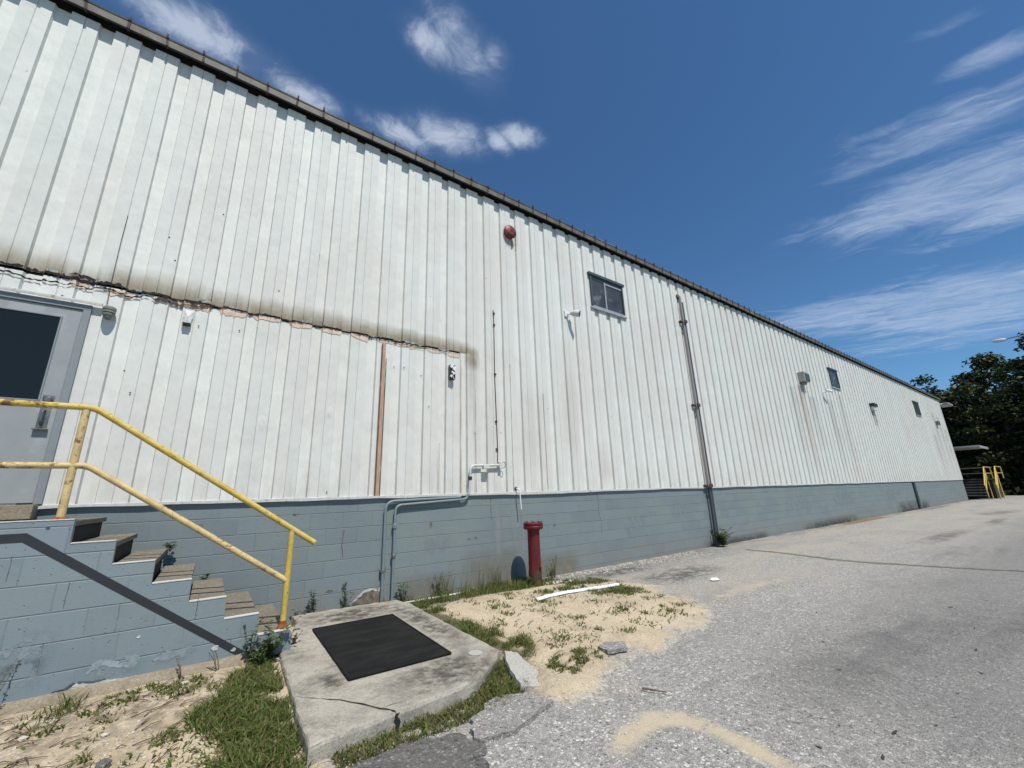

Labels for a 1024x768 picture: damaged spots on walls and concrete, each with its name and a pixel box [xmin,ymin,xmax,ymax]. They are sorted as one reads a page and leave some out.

peeling [0,264,460,358]
crack [296,696,401,731]